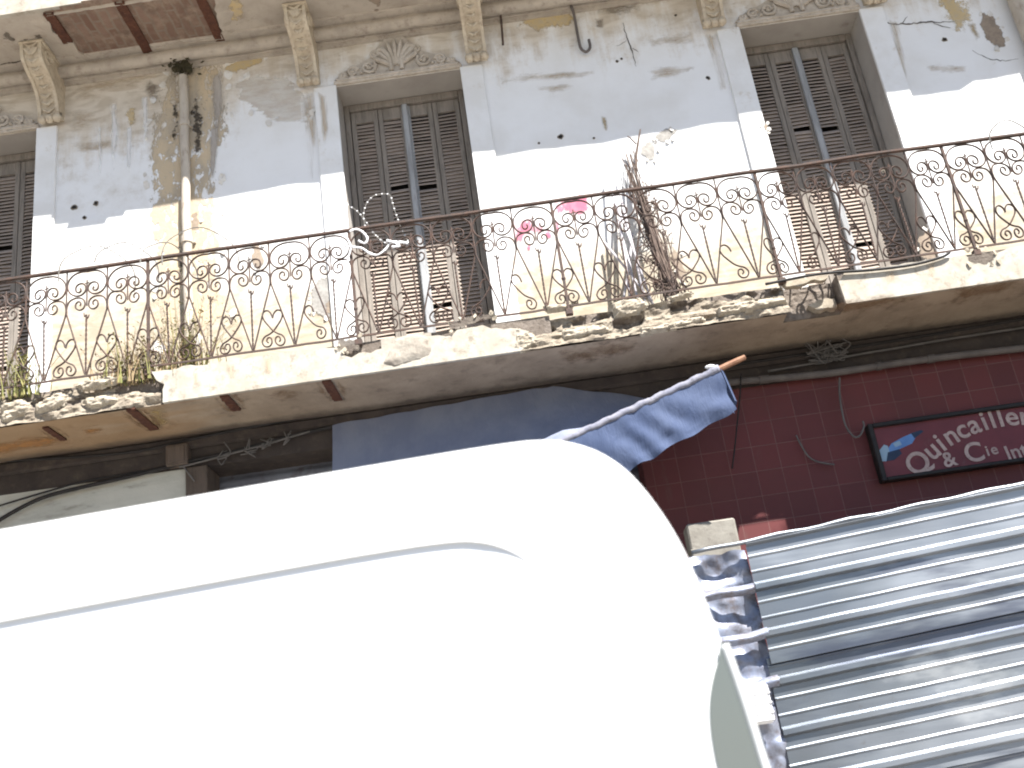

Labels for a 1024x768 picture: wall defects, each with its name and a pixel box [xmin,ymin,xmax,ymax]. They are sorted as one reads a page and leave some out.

peeling [517,14,580,32]
crack [887,16,955,28]
peeling [979,10,1010,52]
peeling [126,58,315,354]
spalling [448,310,497,334]
spalling [515,250,839,354]
spalling [0,375,163,441]